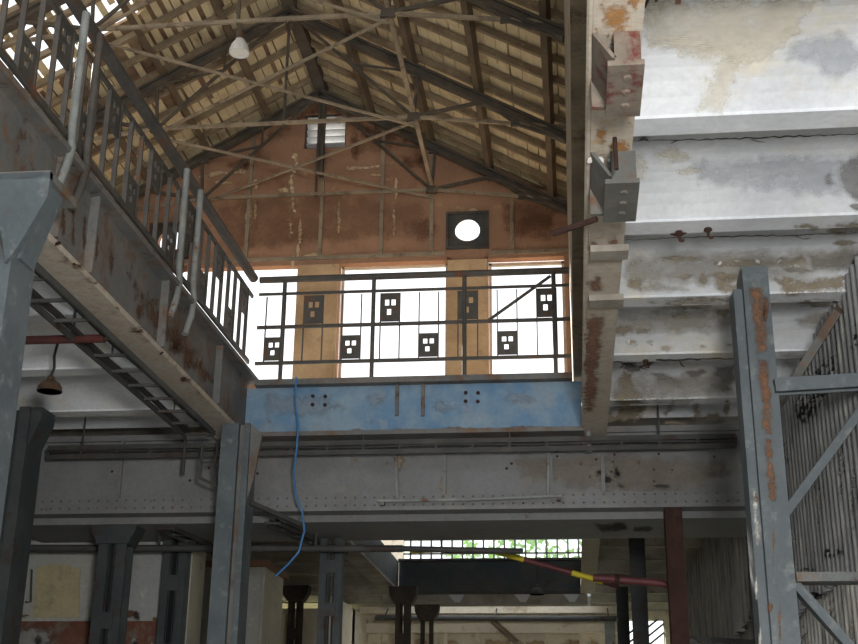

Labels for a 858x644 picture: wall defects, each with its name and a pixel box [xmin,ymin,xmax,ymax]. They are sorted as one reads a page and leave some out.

rust [595,0,639,45]
rust [131,281,212,382]
rust [583,317,604,411]
rust [750,288,776,501]
spalling [19,628,51,644]